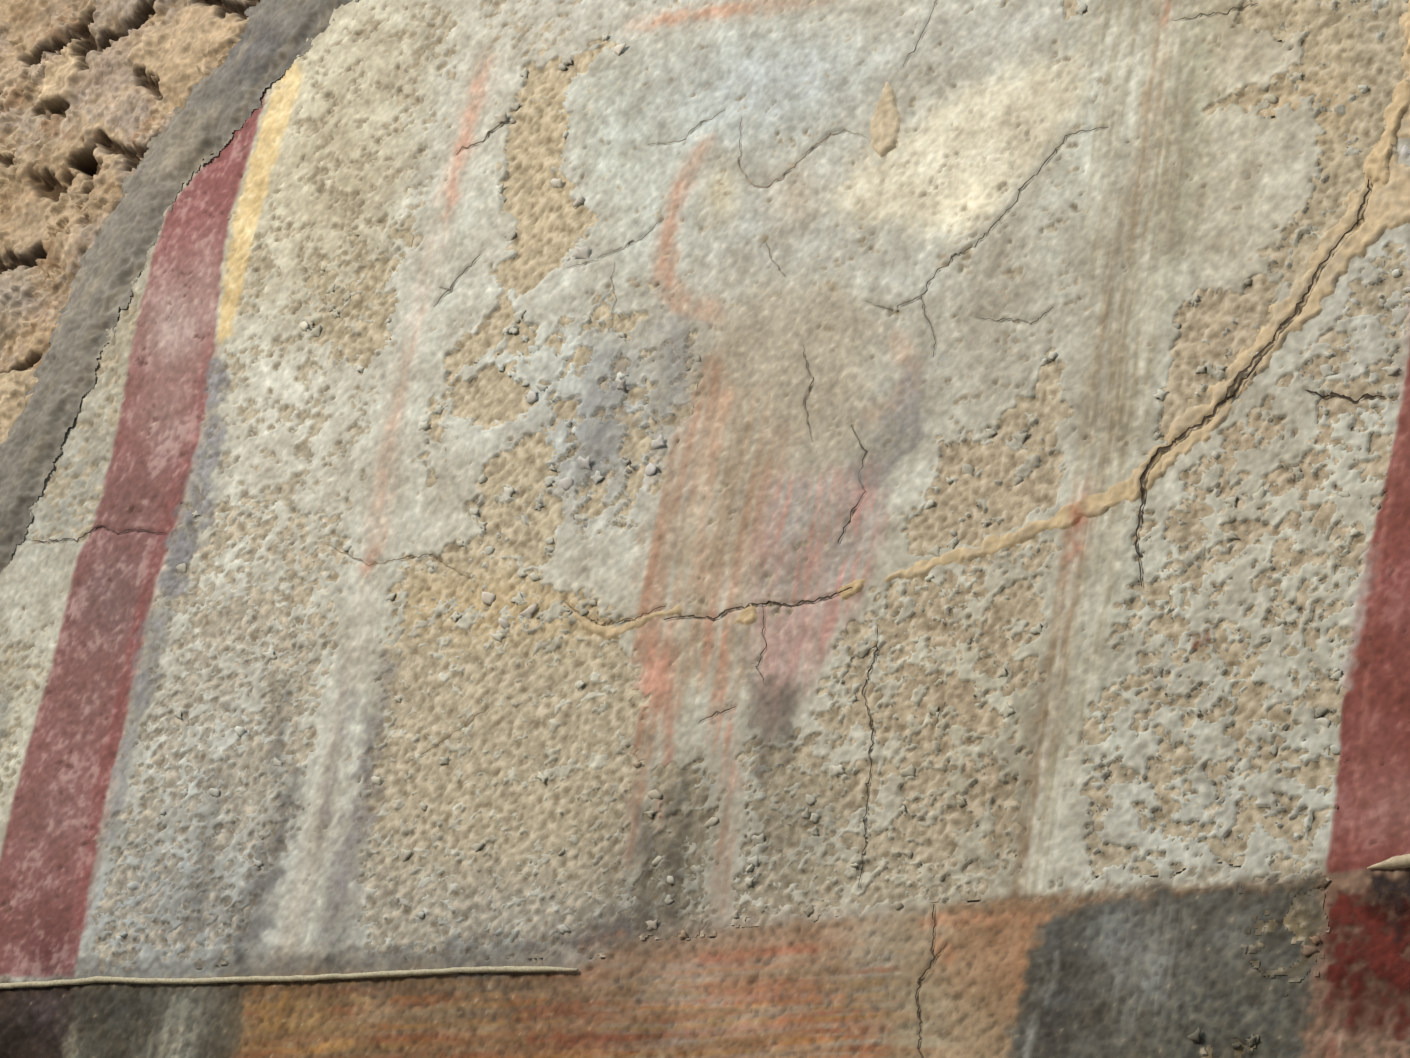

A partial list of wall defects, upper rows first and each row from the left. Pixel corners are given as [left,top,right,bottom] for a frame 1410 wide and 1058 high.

crack [648,110,867,187]
crack [867,127,1109,357]
flaking render [1153,0,1409,444]
crack [29,525,167,543]
crack [563,587,852,682]
flaking render [353,34,1075,959]
crack [838,425,867,542]
flaking render [1080,241,1410,995]
crack [1135,179,1371,586]
crack [1305,390,1385,404]
crack [858,627,878,885]
crack [915,905,947,1058]